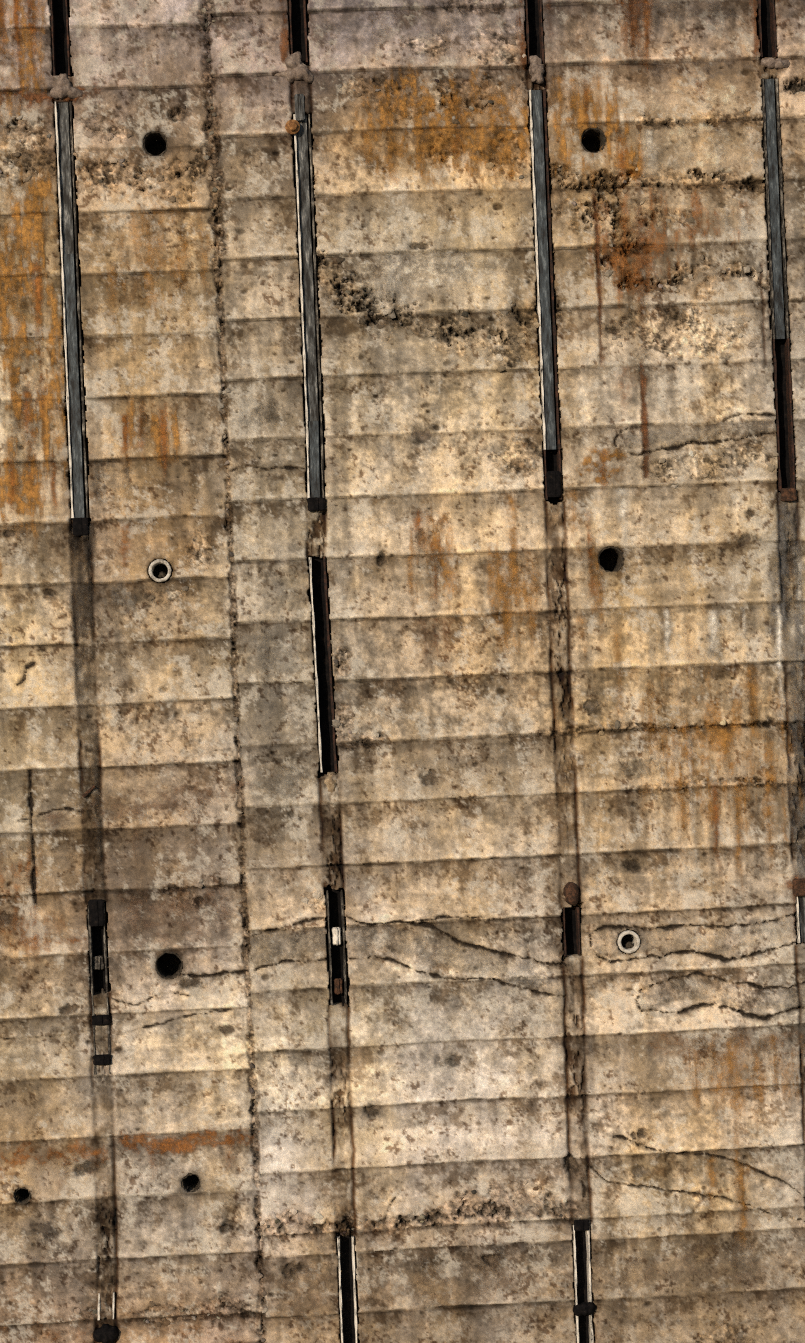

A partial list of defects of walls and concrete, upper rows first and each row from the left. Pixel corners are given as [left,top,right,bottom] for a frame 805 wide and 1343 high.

spalling [0,115,58,192]
spalling [73,112,212,206]
spalling [167,106,189,122]
rust [363,76,530,179]
rust [0,178,67,534]
spalling [316,249,566,372]
spalling [548,164,772,365]
spalling [488,435,543,479]
crack [614,412,775,455]
crack [114,913,805,1028]
spalling [221,1180,584,1242]
crack [581,1135,805,1220]